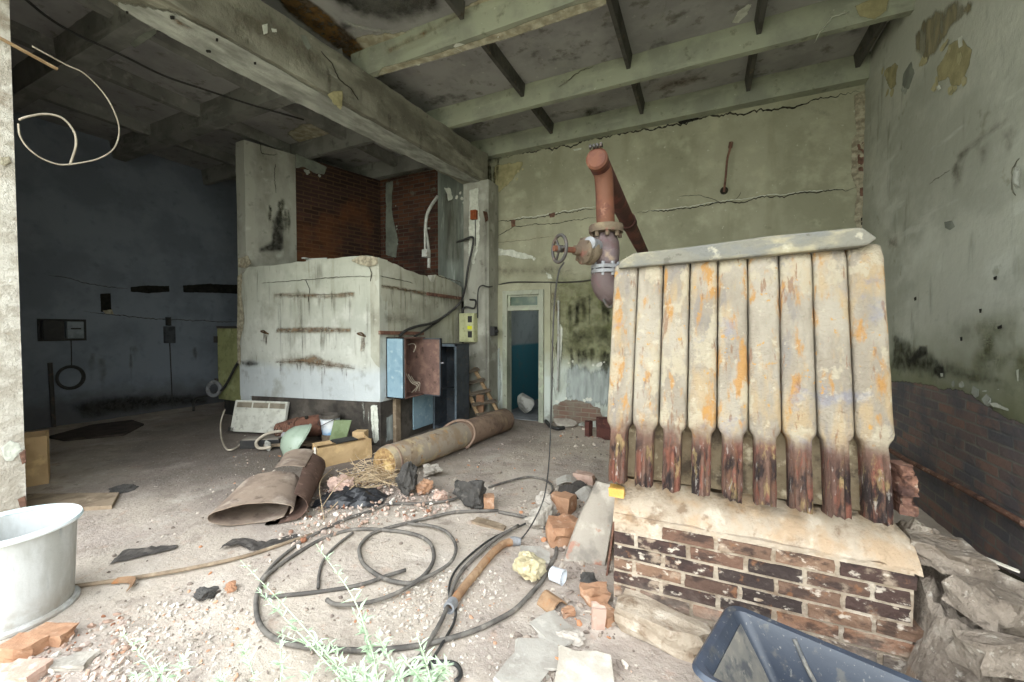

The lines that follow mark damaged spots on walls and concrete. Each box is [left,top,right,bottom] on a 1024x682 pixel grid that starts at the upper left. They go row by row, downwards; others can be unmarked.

damp [337,0,436,18]
peeling [881,1,972,97]
crack [507,91,858,158]
spalling [851,90,866,228]
crack [638,187,856,213]
crack [498,207,596,243]
damp [556,299,609,370]
corrosion [280,356,355,373]
damp [893,337,944,377]
peeling [951,381,1008,411]